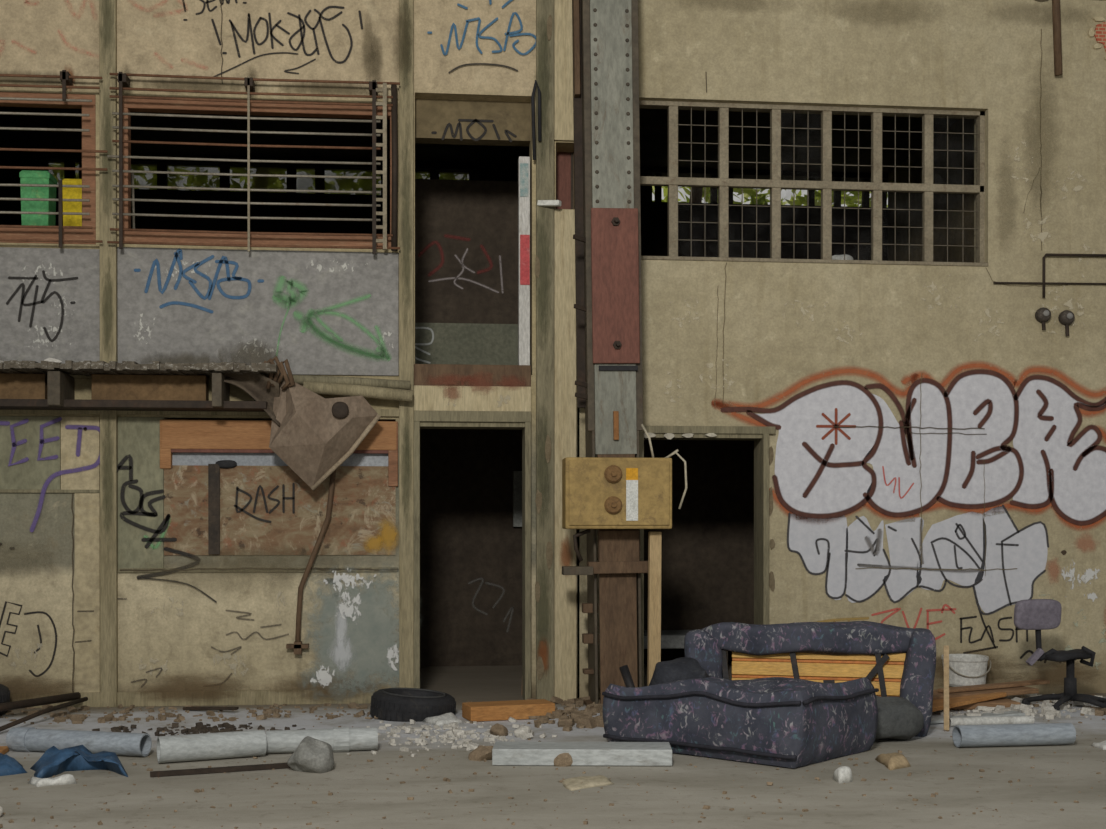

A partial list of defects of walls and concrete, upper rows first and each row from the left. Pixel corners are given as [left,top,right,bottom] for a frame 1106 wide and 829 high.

spalling [1088,17,1106,60]
peeling [308,569,399,692]
leakage [0,678,64,700]
leakage [149,676,229,698]
leakage [294,677,372,697]